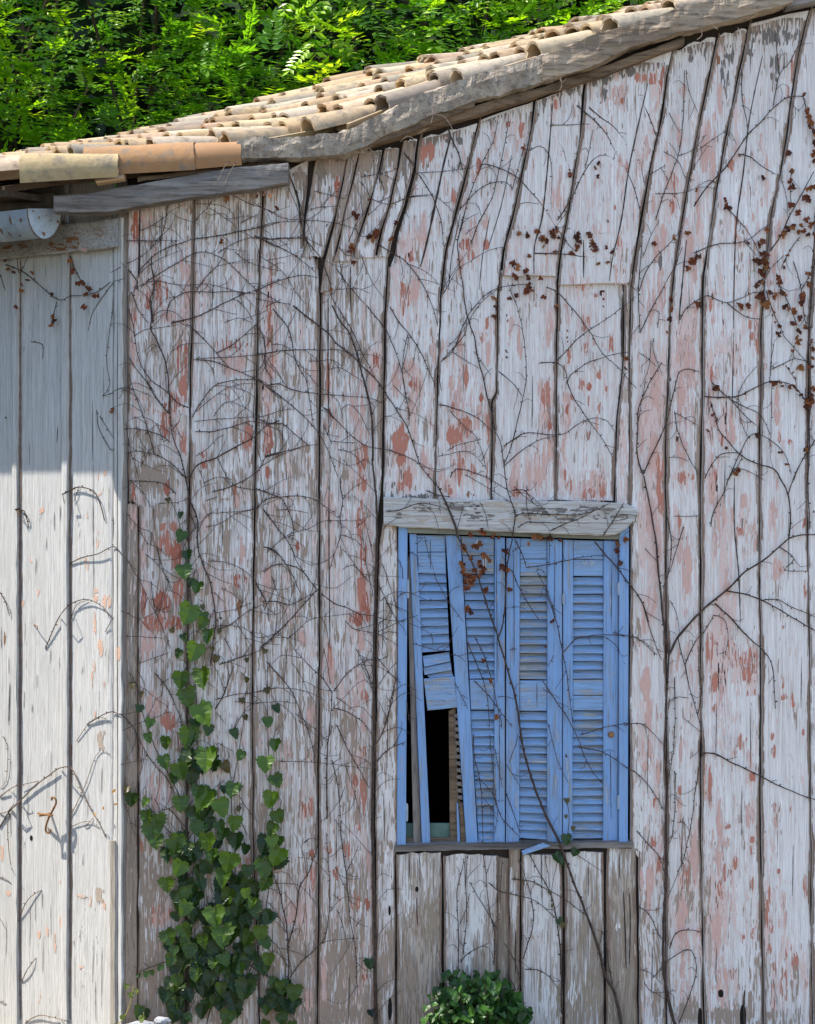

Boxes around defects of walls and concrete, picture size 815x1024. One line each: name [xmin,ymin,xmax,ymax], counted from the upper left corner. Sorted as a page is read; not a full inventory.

peeling [116,129,633,1024]
peeling [506,109,539,177]
peeling [554,36,814,736]
peeling [568,666,815,1024]